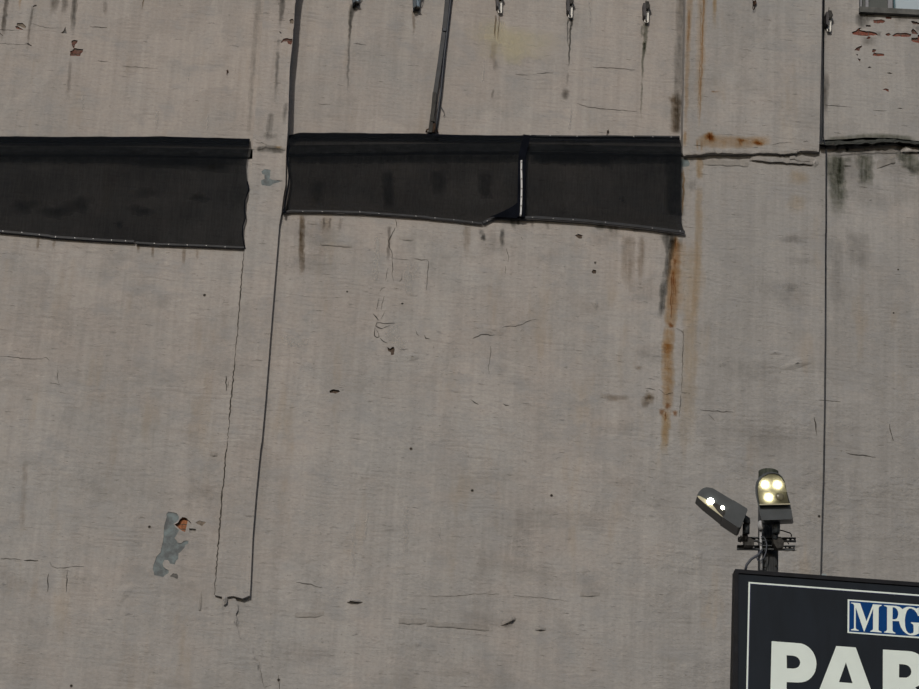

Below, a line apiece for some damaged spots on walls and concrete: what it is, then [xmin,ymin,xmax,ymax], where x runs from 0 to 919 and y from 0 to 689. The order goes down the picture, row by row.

spalling [852,17,919,68]
crack [374,219,429,350]
peeling [153,512,206,579]